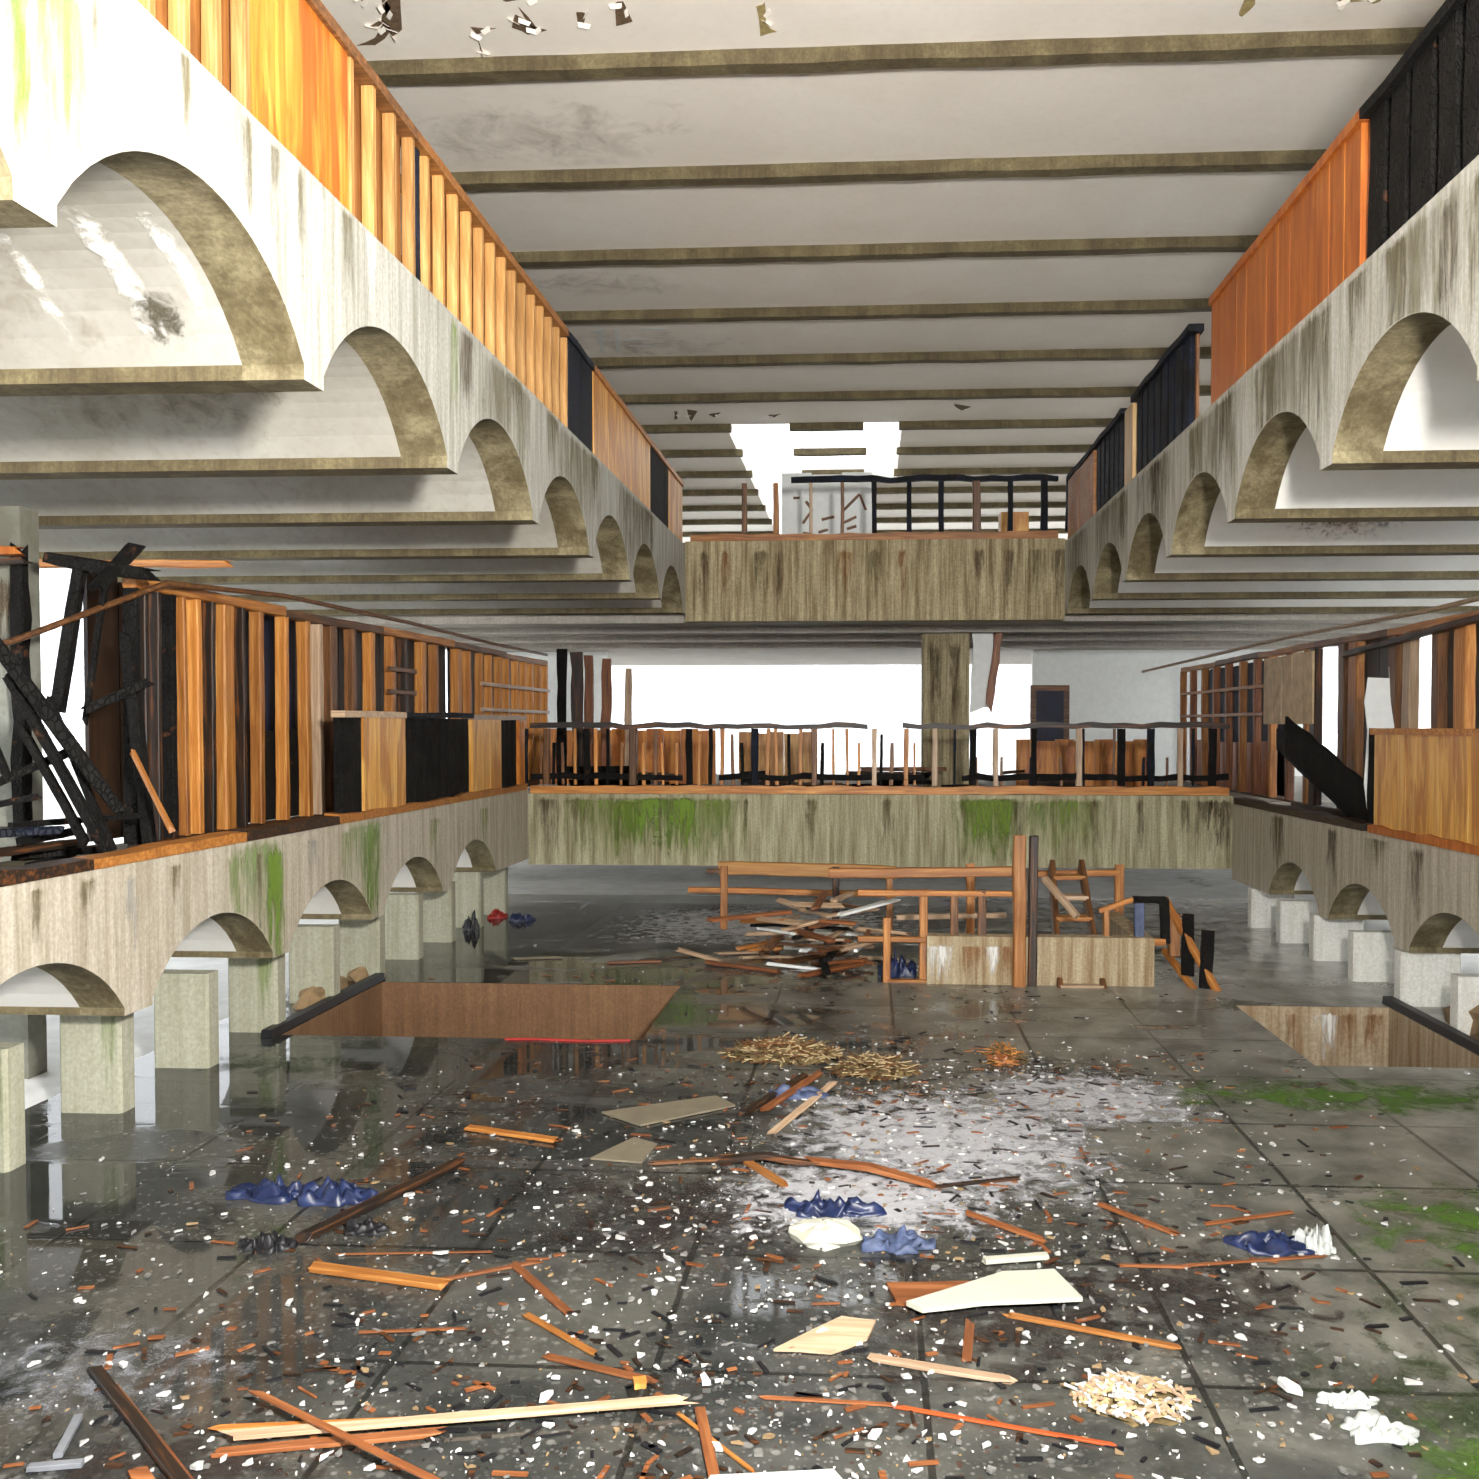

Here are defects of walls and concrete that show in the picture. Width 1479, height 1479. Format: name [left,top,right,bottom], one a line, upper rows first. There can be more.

damp [11,0,96,114]
peeling [354,0,402,46]
peeling [470,0,546,58]
peeling [576,10,591,29]
peeling [608,1,632,26]
damp [1439,174,1479,298]
damp [1386,220,1424,316]
spalling [133,297,183,339]
damp [1256,312,1326,428]
damp [572,798,748,854]
damp [962,799,1096,857]
damp [230,844,285,953]